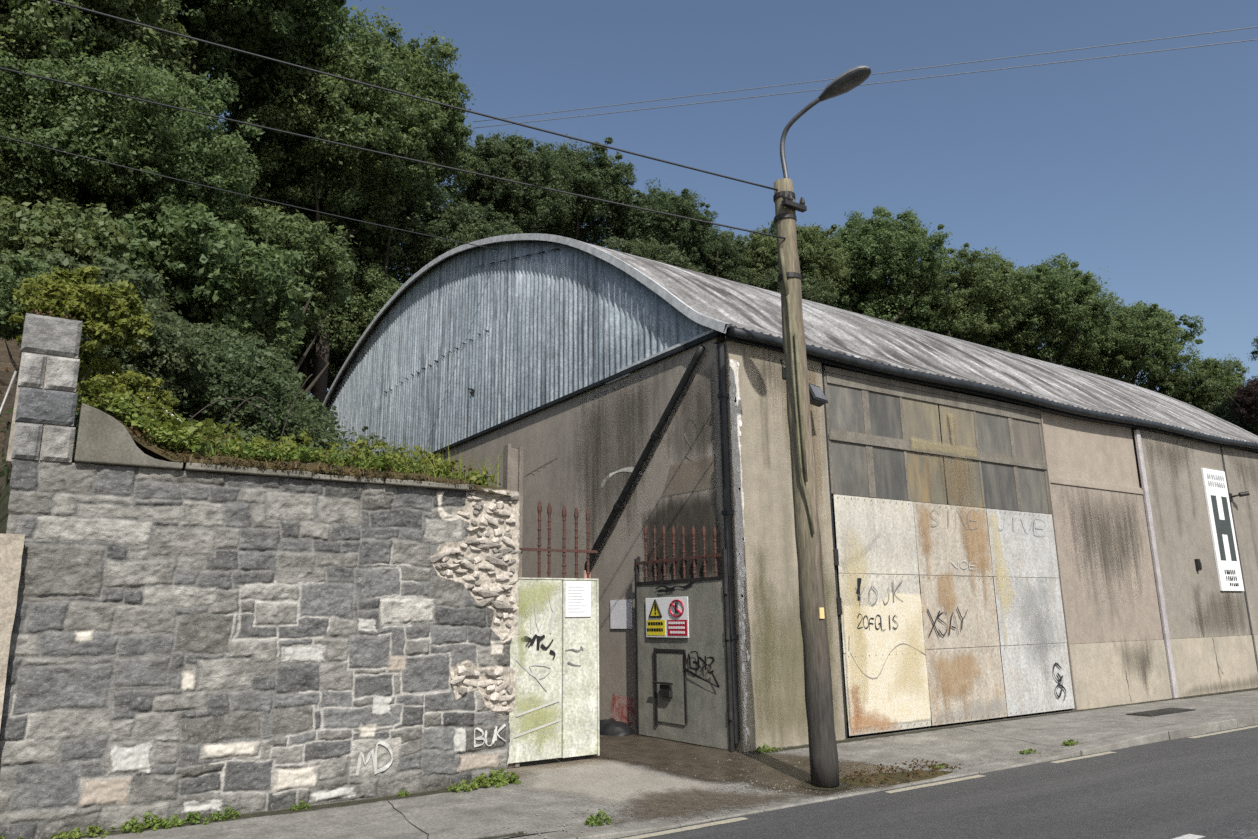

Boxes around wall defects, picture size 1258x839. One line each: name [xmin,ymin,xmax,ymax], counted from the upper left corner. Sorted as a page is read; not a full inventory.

spalling [427,488,521,643]
water stain [647,495,721,581]
corrosion [939,575,956,626]
corrosion [962,510,988,580]
spalling [449,660,517,715]
corrosion [851,689,889,733]